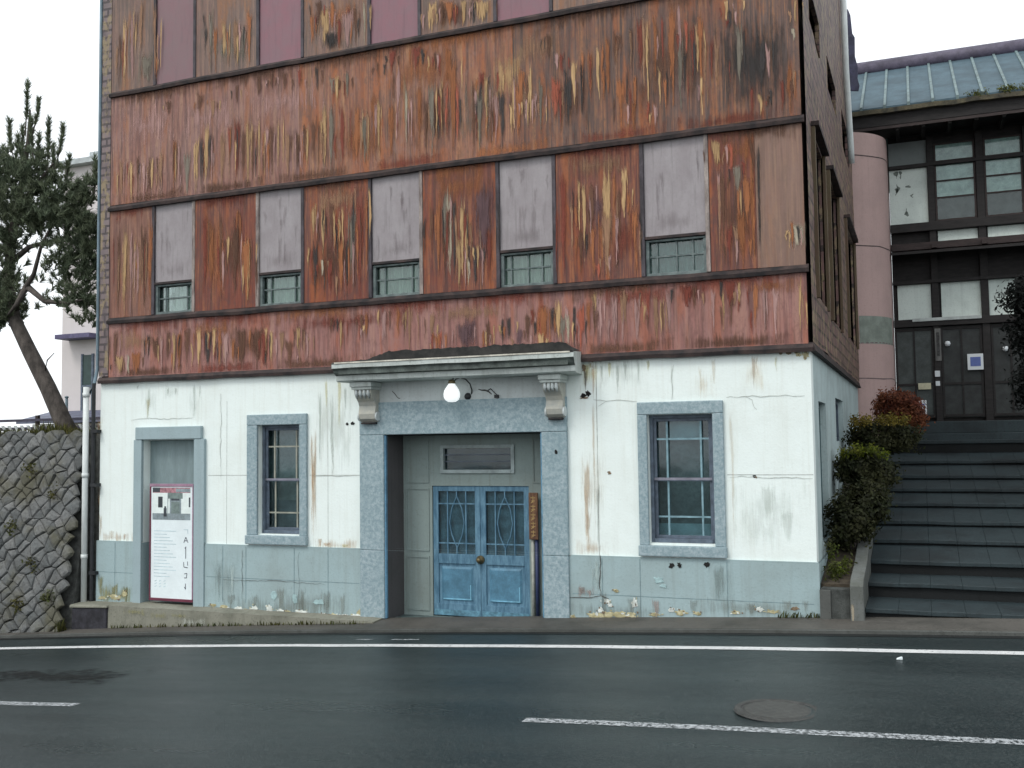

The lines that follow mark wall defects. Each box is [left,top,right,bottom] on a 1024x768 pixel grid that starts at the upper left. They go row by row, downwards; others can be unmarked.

corrosion [108,0,808,376]
crack [570,557,609,599]
spalling [570,589,701,618]